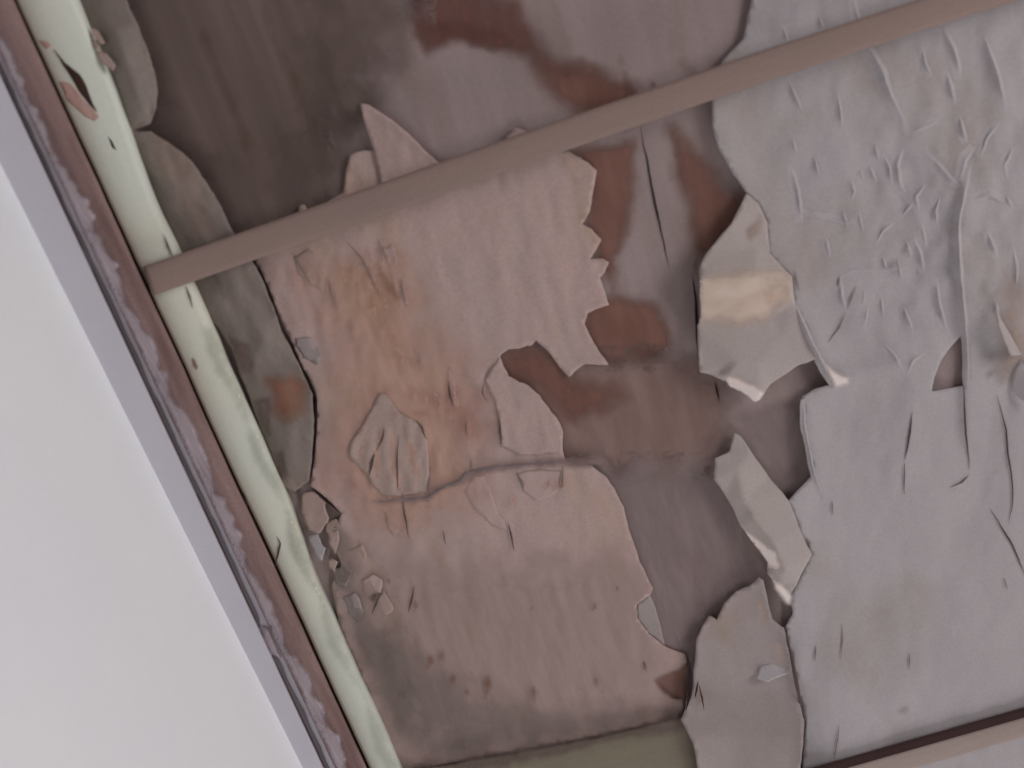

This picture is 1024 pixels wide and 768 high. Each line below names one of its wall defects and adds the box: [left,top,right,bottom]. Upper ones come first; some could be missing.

peeling [80,0,235,253]
peeling [329,104,439,201]
crack [641,129,669,266]
peeling [0,40,346,768]
peeling [195,151,688,768]
crack [369,381,604,537]
peeling [681,0,1024,768]